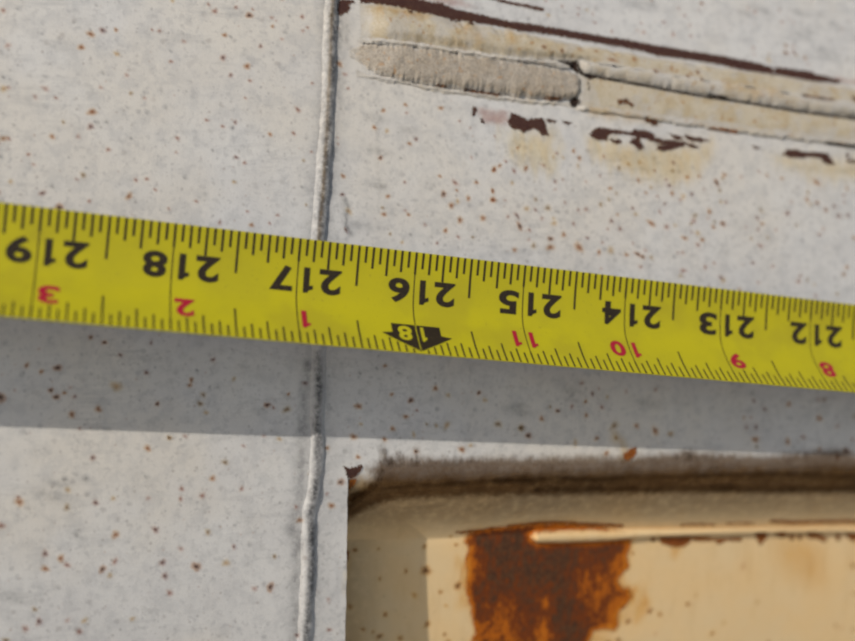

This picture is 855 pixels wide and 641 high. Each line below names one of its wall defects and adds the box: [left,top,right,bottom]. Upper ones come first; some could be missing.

peeling [337,0,843,84]
peeling [508,113,572,136]
peeling [590,118,708,151]
peeling [783,149,835,165]
rust [450,523,633,641]